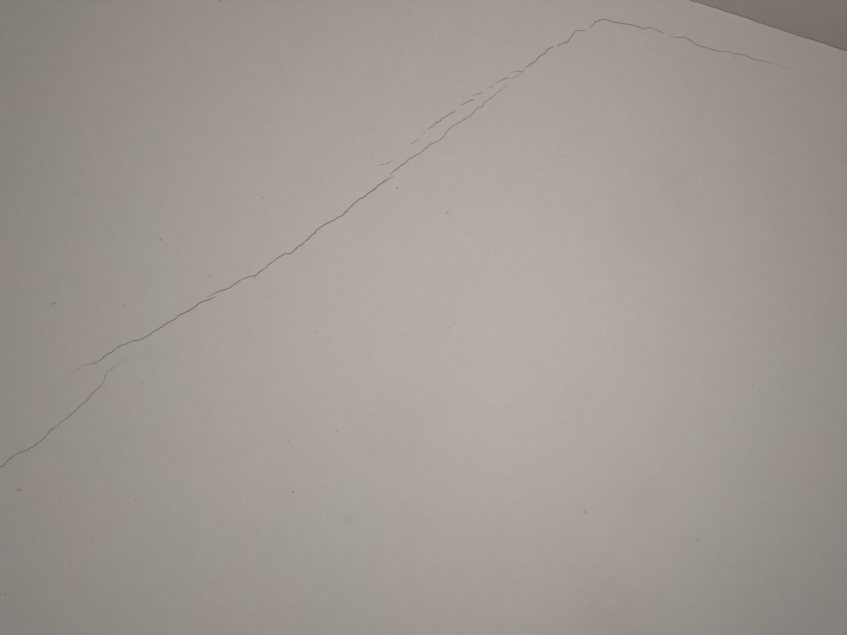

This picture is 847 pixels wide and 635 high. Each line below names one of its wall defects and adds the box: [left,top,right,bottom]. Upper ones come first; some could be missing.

crack [2,19,791,467]